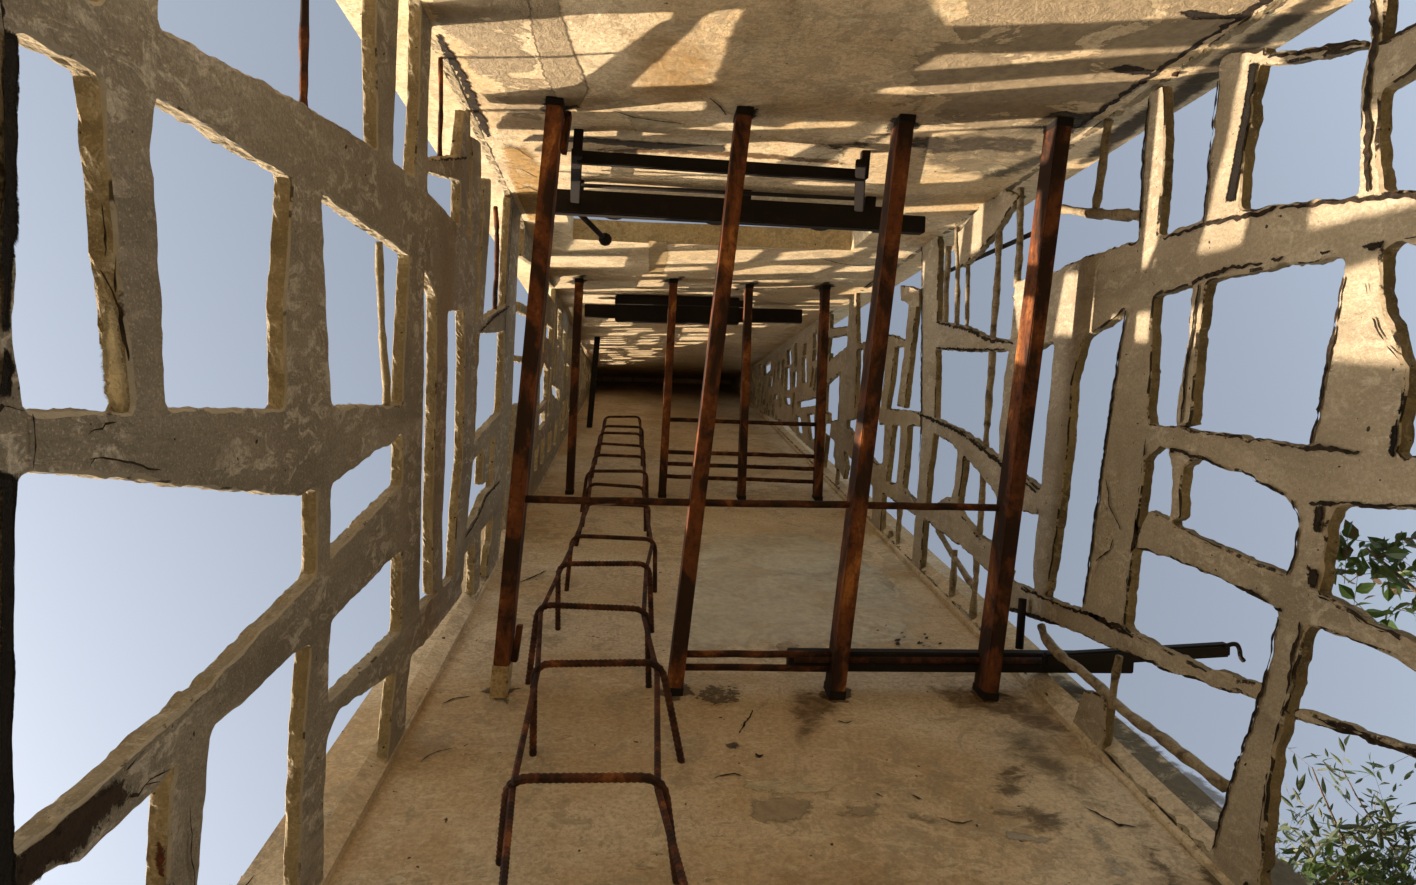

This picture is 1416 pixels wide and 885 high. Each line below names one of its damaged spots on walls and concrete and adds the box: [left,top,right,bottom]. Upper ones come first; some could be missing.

peeling [892,0,1259,131]
corrosion [503,147,540,220]
spalling [1061,120,1140,222]
spalling [1225,63,1258,202]
crack [88,421,160,471]
spalling [0,470,131,885]